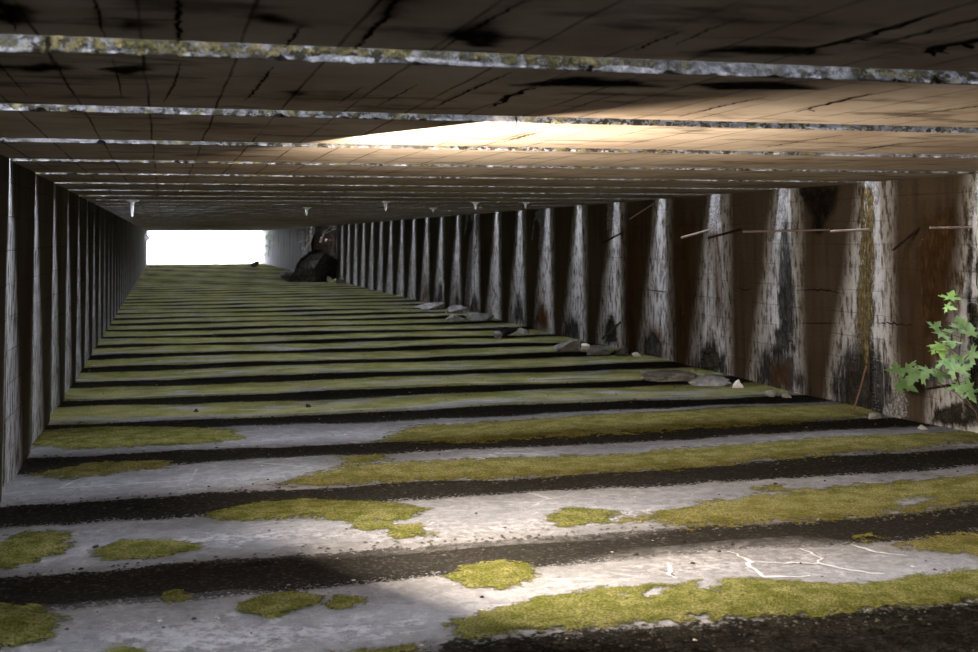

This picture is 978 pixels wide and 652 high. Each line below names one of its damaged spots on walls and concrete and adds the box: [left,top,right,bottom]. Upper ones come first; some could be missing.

crack [42,36,75,97]
crack [82,0,184,102]
crack [245,27,303,101]
crack [354,0,397,50]
crack [439,0,531,51]
crack [802,14,978,56]
crack [430,73,561,142]
crack [728,544,902,577]